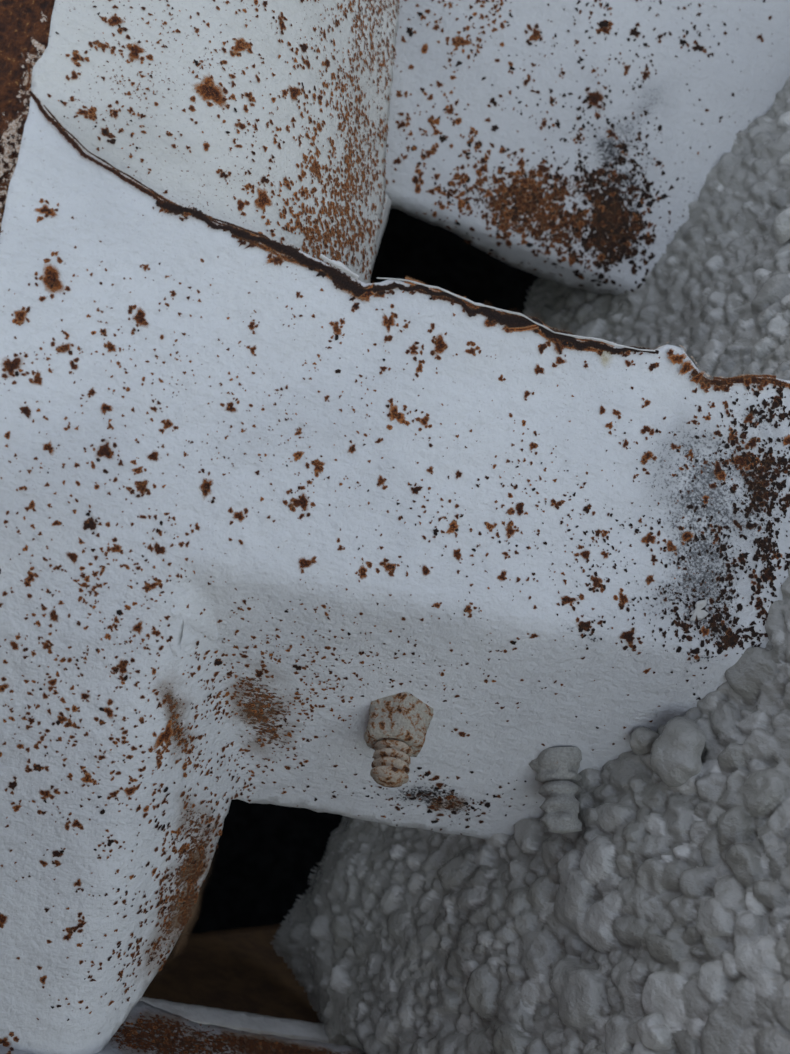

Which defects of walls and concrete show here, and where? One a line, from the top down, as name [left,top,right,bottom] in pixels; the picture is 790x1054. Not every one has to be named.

crack [26,63,176,204]
corrosion [35,198,59,223]
corrosion [3,251,131,339]
corrosion [48,0,738,457]
corrosion [0,292,790,1014]
corrosion [98,1012,350,1054]